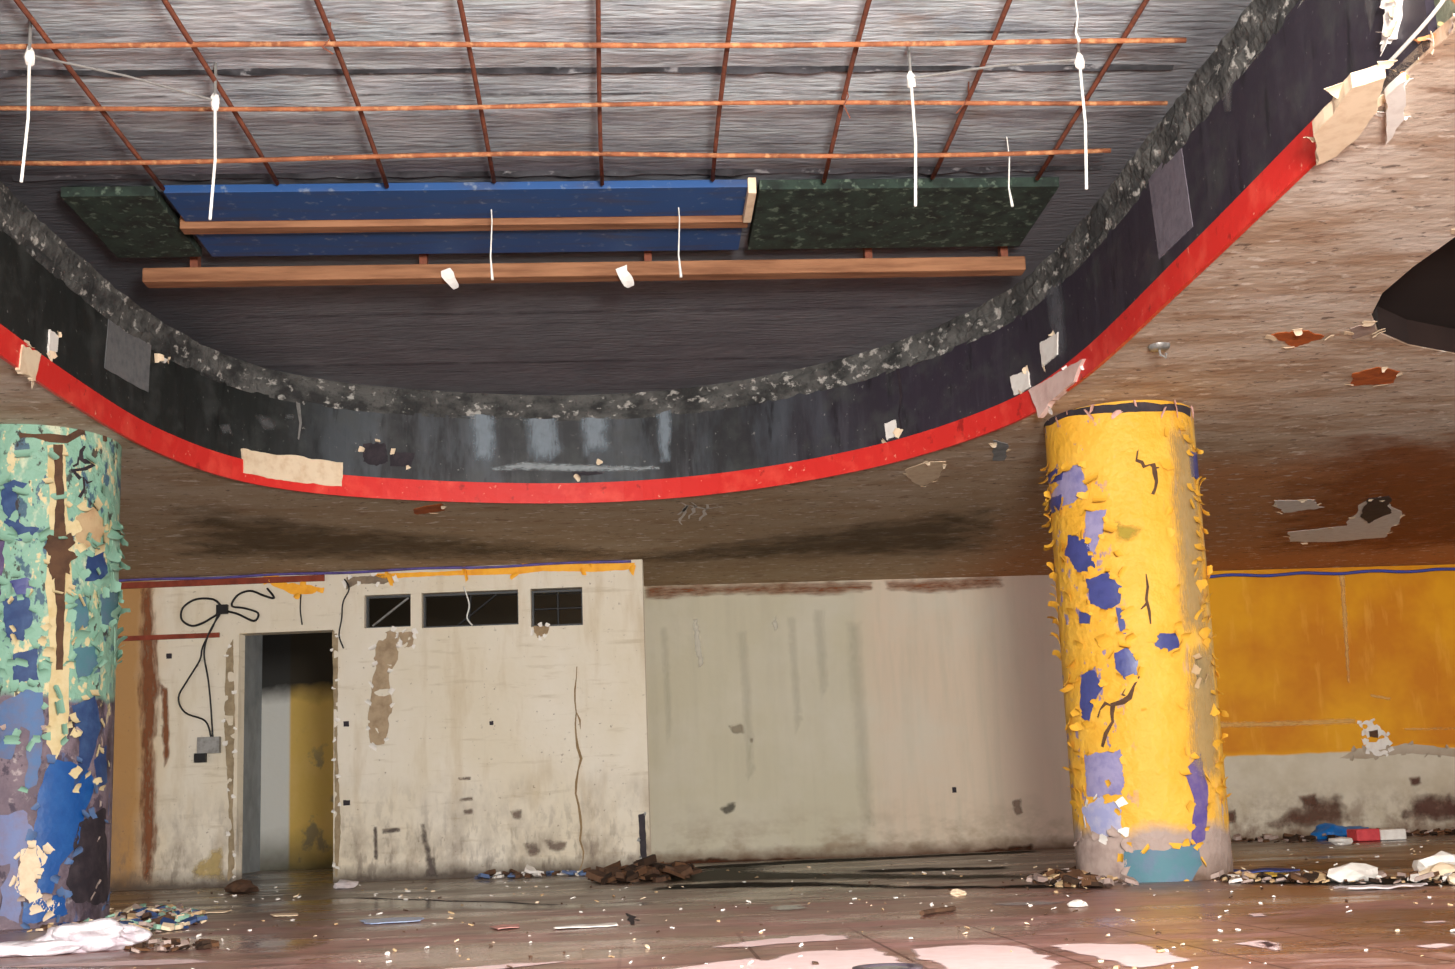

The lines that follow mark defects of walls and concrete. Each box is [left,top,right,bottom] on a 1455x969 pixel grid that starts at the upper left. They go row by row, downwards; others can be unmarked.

spalling [0,0,1187,191]
peeling [1303,60,1414,165]
peeling [1010,331,1232,896]
flaking render [365,626,418,752]
crack [574,667,584,871]
crack [1097,676,1140,748]
water stain [1270,795,1342,828]
peeling [1341,718,1455,761]
water stain [1403,777,1455,820]